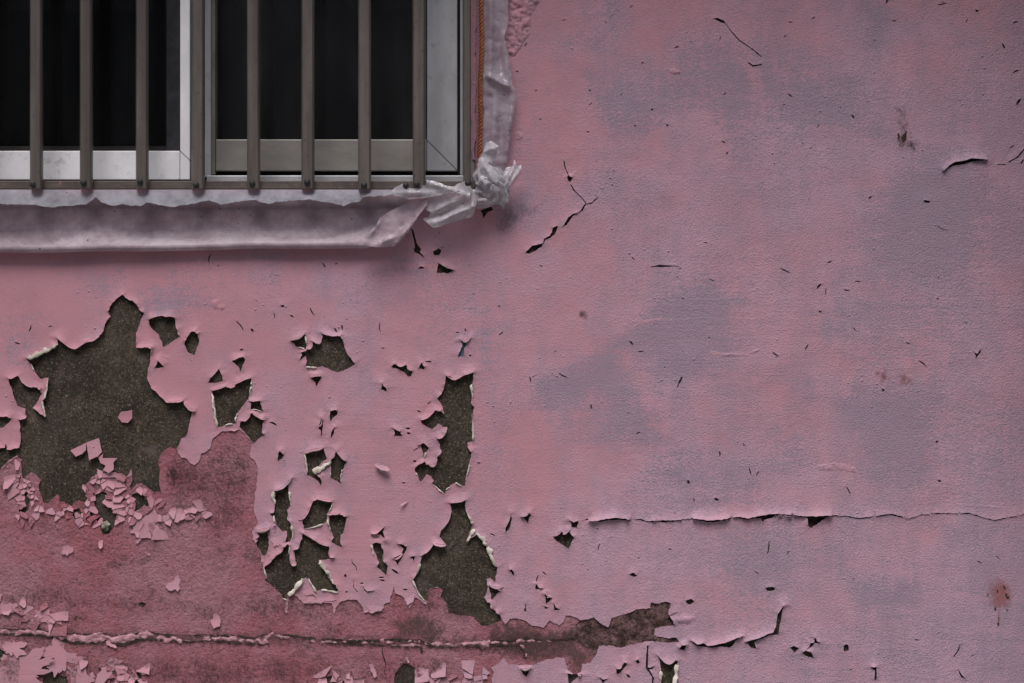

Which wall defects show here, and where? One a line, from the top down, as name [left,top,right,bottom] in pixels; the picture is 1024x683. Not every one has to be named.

crack [525,162,598,254]
peeling [0,295,595,683]
crack [585,513,1016,528]
crack [0,628,586,677]